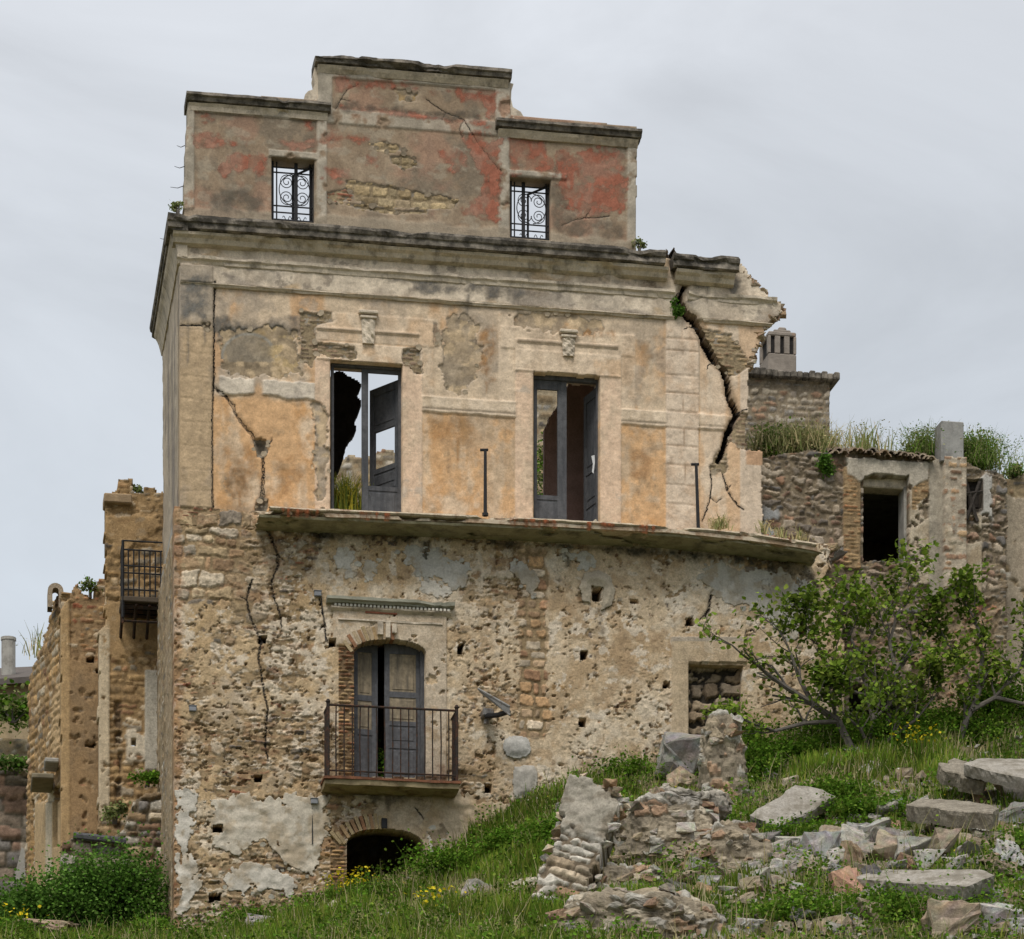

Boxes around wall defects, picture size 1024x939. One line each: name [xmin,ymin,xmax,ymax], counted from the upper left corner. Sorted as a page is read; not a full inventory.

crack [426,99,501,171]
peeling [326,88,629,223]
crack [666,247,676,259]
crack [179,281,272,507]
flaking render [203,308,357,379]
flaking render [402,313,484,396]
crack [676,286,748,520]
flaking render [702,268,786,376]
flaking render [394,544,472,599]
flaking render [509,558,540,599]
crack [241,532,283,761]
flaking render [174,788,332,916]